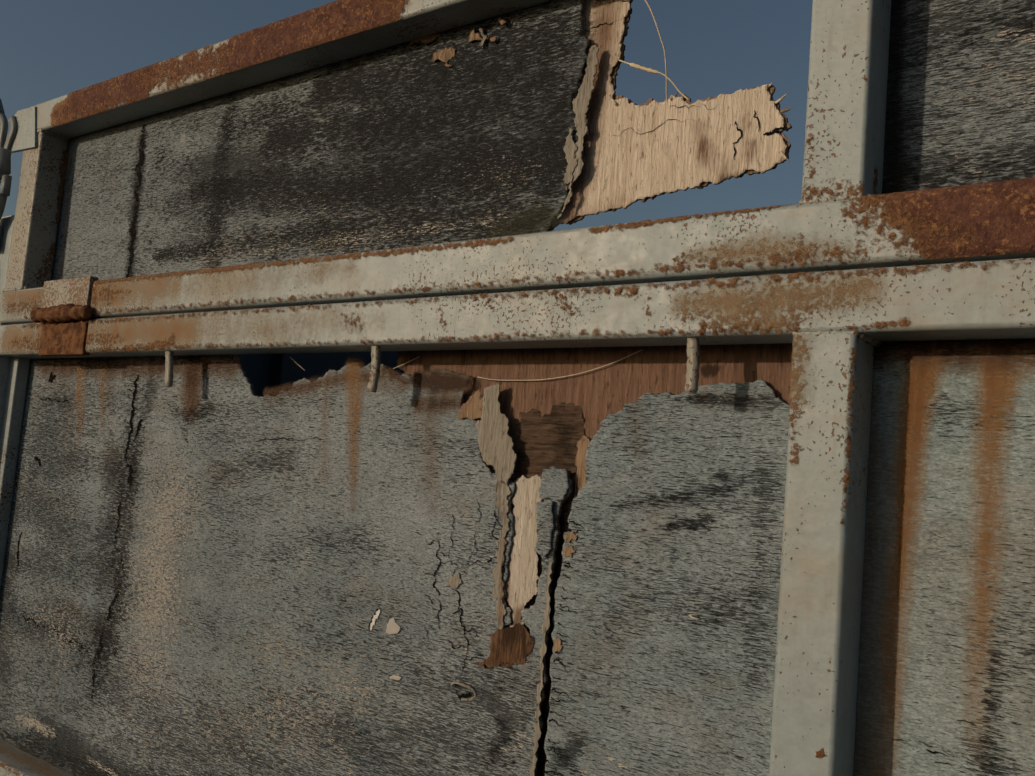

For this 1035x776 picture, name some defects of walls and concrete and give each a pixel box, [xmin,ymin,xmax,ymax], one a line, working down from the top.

rust [50,0,407,127]
rust [2,135,1035,464]
crack [9,356,153,718]
peeling [368,608,401,635]
peeling [450,681,477,701]
crack [424,496,508,676]
peeling [476,467,569,688]
crack [529,501,586,776]
rust [872,349,941,776]
rust [975,353,1017,641]